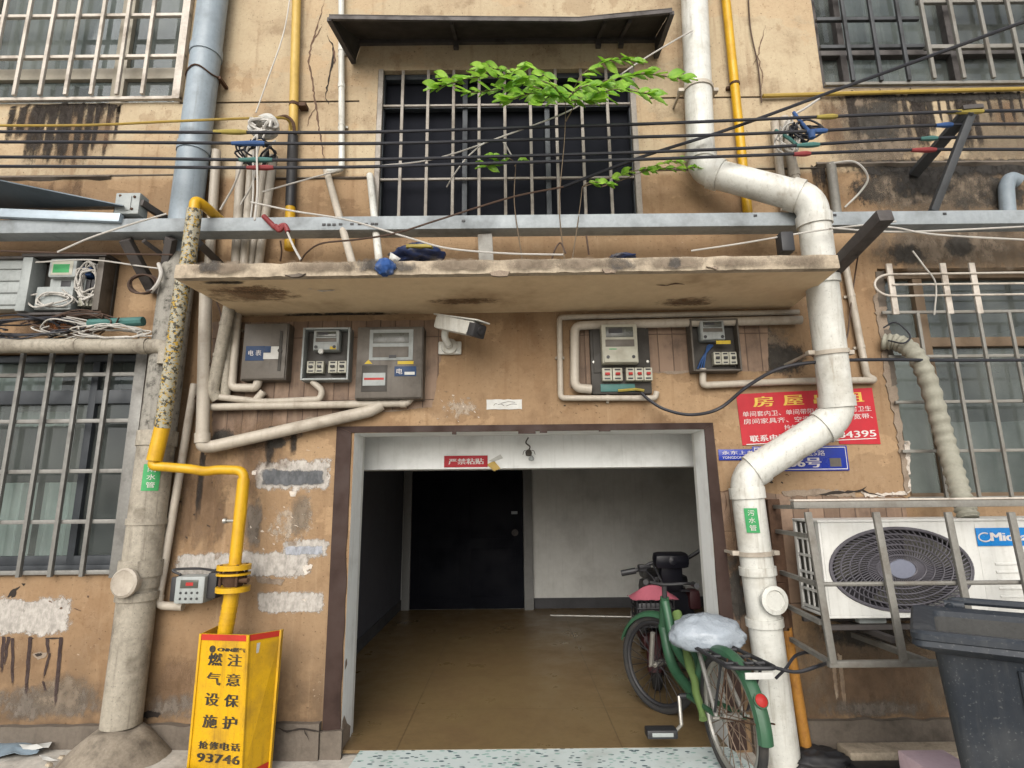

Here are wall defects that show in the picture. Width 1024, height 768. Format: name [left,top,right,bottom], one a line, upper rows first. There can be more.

crack [307,0,336,156]
leakage [5,102,121,163]
leakage [811,164,827,187]
leakage [822,88,1024,211]
peeling [176,552,229,575]
peeling [242,447,331,614]
leakage [0,637,97,720]